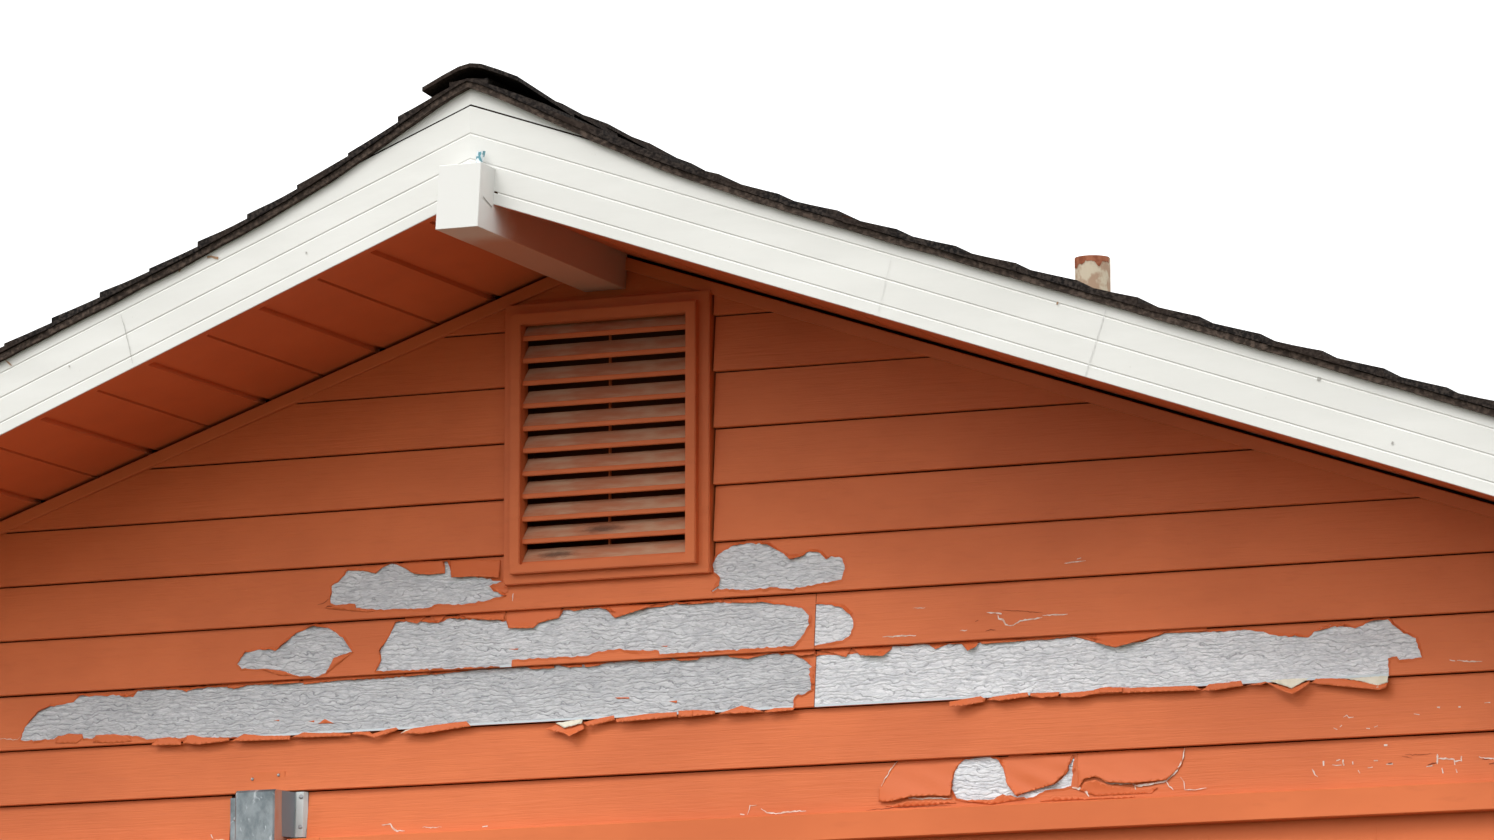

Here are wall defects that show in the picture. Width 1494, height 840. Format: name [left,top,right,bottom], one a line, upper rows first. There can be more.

peeling [2,540,1423,746]
peeling [879,754,1077,808]